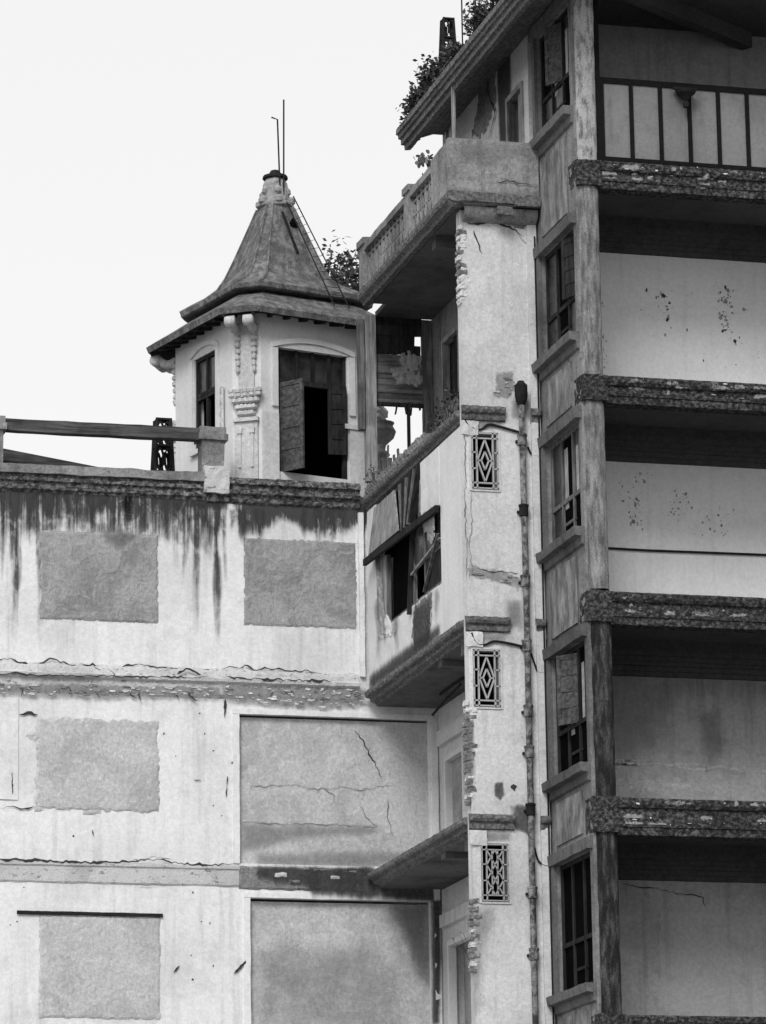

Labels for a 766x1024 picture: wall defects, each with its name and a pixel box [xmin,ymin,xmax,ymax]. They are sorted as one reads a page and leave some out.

crack [452,179,530,253]
flaking render [455,222,478,307]
peeling [710,285,747,344]
peeling [493,372,515,398]
leakage [0,491,368,606]
peeling [0,682,366,717]
crack [247,731,397,835]
flaking render [462,700,478,806]
crack [625,884,705,906]
flaking render [467,898,482,973]